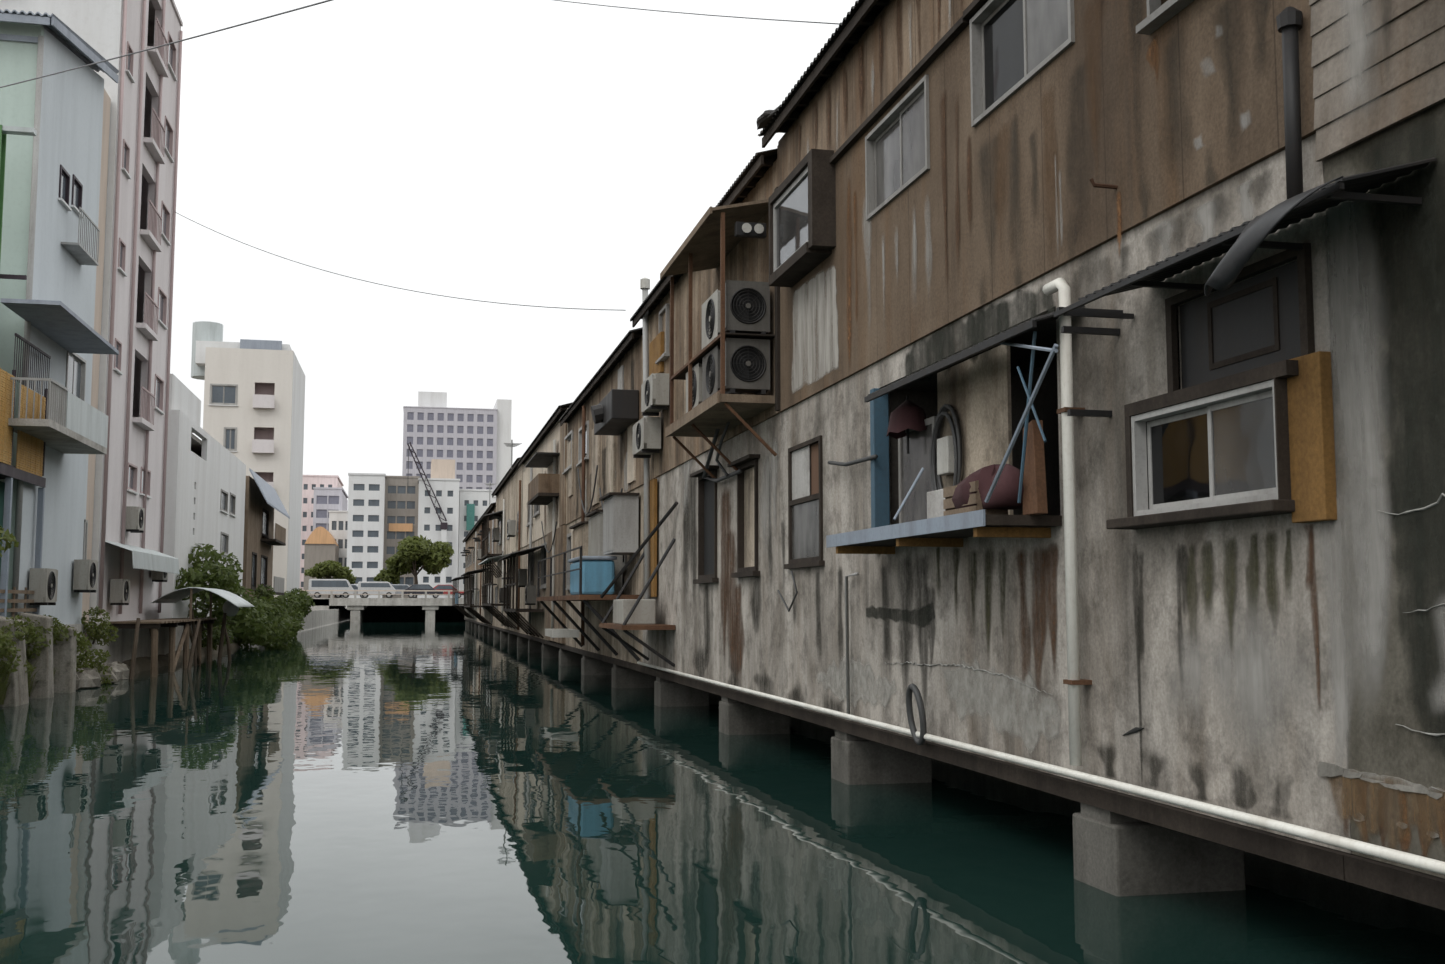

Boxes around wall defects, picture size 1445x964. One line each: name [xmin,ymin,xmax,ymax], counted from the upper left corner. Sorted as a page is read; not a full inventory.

water stain [1345,0,1366,92]
water stain [1320,127,1445,752]
crack [1377,493,1445,515]
corrosion [1017,545,1058,678]
water stain [1177,531,1292,724]
crack [1403,603,1445,613]
water stain [1134,571,1160,785]
crack [1396,724,1445,737]
water stain [1100,748,1114,777]
water stain [1193,768,1205,800]
water stain [1235,772,1254,807]